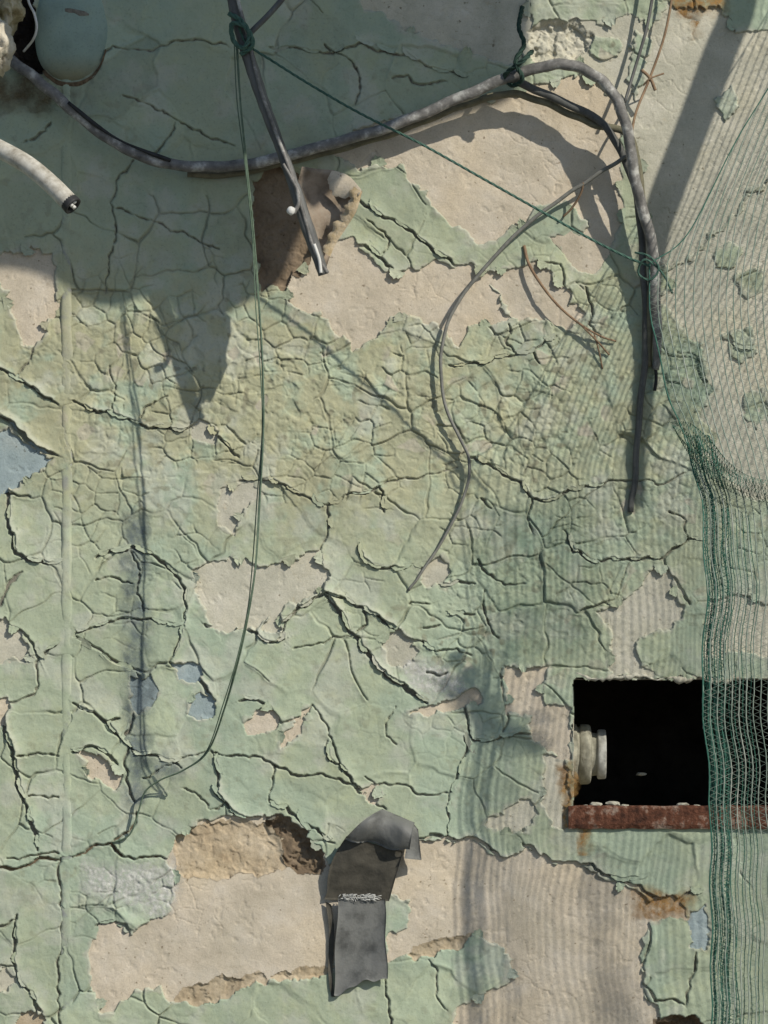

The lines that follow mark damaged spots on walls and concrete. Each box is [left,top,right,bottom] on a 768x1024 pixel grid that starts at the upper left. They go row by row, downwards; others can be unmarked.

crack [360,199,452,268]
peeling [252,167,585,352]
peeling [334,0,768,500]
crack [0,492,64,606]
crack [23,544,208,699]
crack [251,560,525,704]
spalling [486,564,768,835]
crack [0,677,523,930]
corrosion [558,767,578,828]
peeling [88,812,338,1013]
peeling [386,836,710,1024]
corrosion [639,892,686,919]